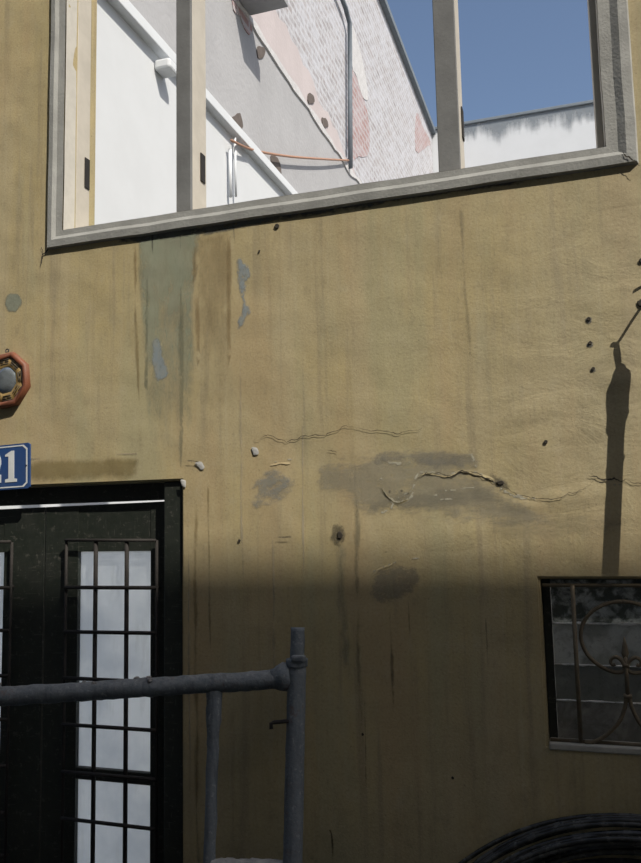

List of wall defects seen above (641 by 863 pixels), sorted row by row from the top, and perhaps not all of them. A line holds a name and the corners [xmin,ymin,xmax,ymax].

water stain [135,228,197,361]
peeling [237,259,250,326]
crack [418,470,641,500]